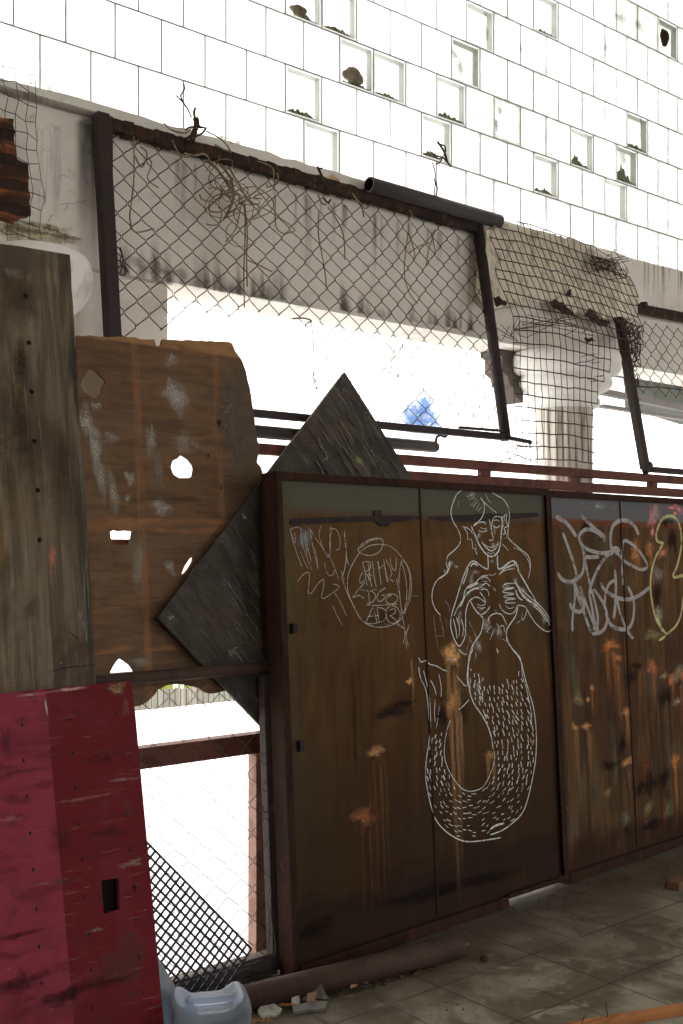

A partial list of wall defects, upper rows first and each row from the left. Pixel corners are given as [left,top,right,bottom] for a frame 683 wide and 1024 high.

spalling [0,117,79,243]
peeling [550,289,628,334]
corrosion [605,641,621,676]